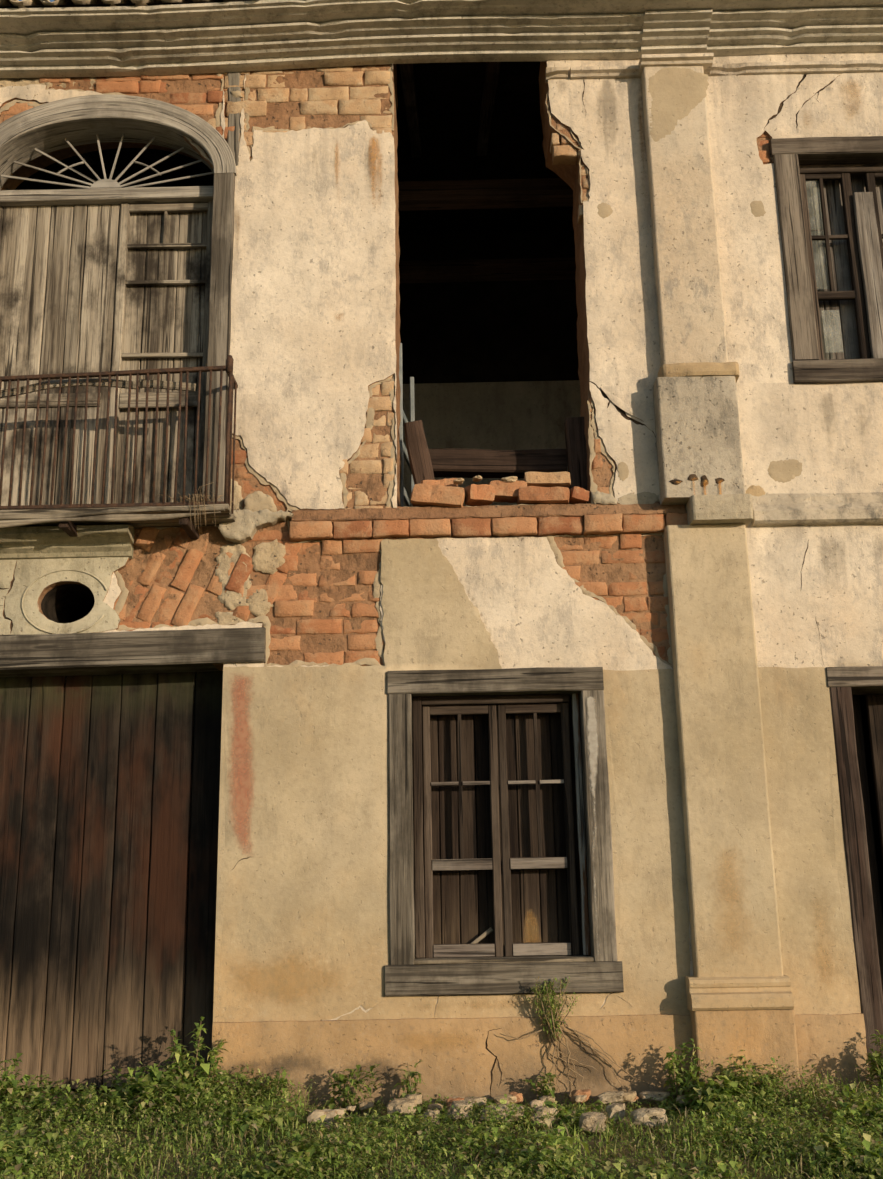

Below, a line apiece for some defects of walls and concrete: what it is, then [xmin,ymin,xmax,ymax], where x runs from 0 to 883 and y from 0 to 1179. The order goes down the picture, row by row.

flaking render [0,64,395,162]
crack [765,75,833,128]
flaking render [183,135,213,168]
flaking render [756,132,773,165]
crack [591,382,656,444]
spalling [669,474,725,495]
flaking render [114,374,688,667]
crack [0,562,17,631]